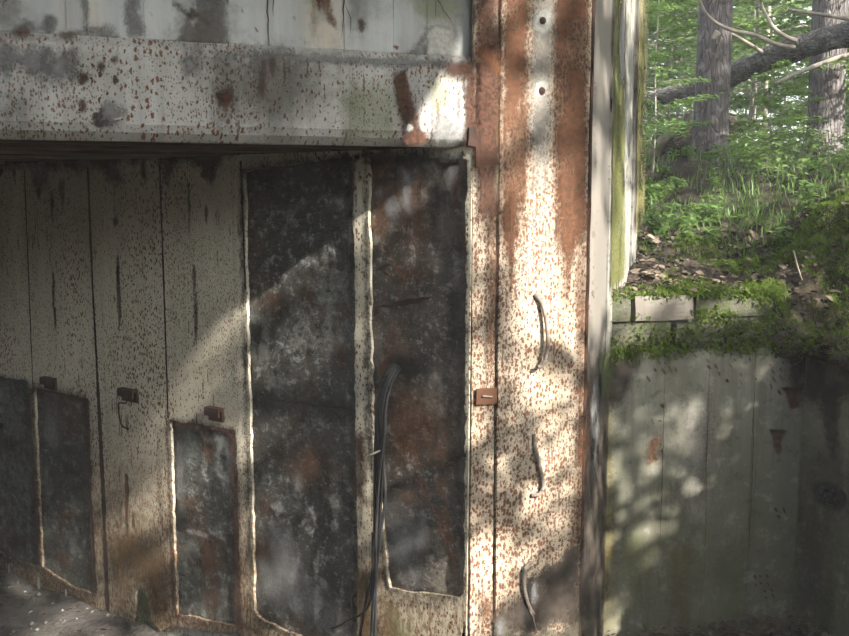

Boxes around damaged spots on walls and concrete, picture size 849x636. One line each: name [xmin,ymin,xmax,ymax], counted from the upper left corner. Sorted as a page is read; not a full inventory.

damp [0,45,78,82]
corrosion [78,57,120,129]
corrosion [0,155,233,223]
corrosion [103,0,533,636]
damp [789,355,849,458]
corrosion [0,373,106,606]
damp [501,343,640,636]